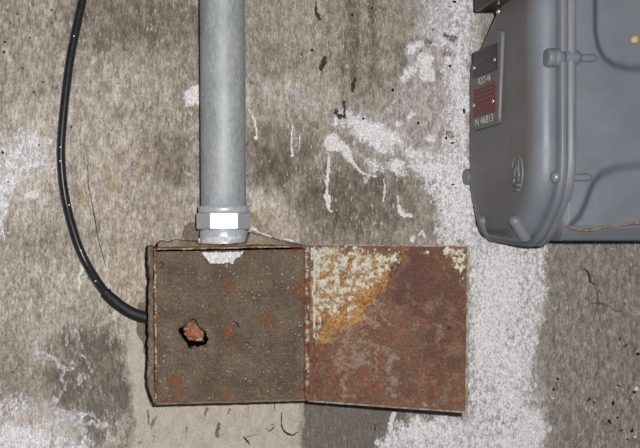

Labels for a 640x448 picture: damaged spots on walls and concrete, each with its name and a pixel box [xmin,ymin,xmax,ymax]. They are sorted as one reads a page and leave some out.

damp [302,0,552,448]
crack [583,268,621,328]
spalling [179,319,208,348]